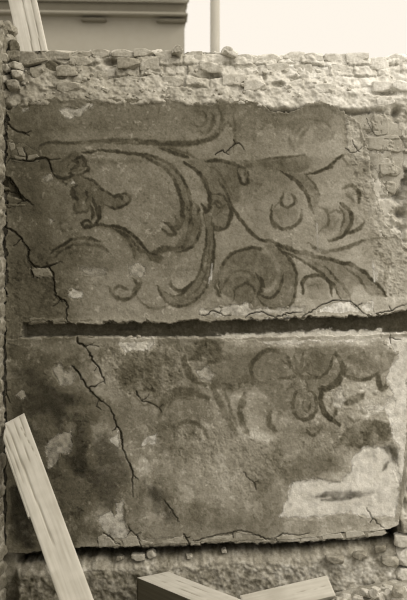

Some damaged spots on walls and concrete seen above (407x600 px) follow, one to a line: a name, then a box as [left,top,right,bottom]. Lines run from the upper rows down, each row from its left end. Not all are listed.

peeling [60,103,93,119]
crack [9,151,56,171]
spalling [346,113,405,196]
crack [3,226,68,320]
crack [247,300,406,319]
peeling [317,299,377,317]
crack [72,337,136,497]
peeling [222,328,407,519]
water stain [12,487,31,546]